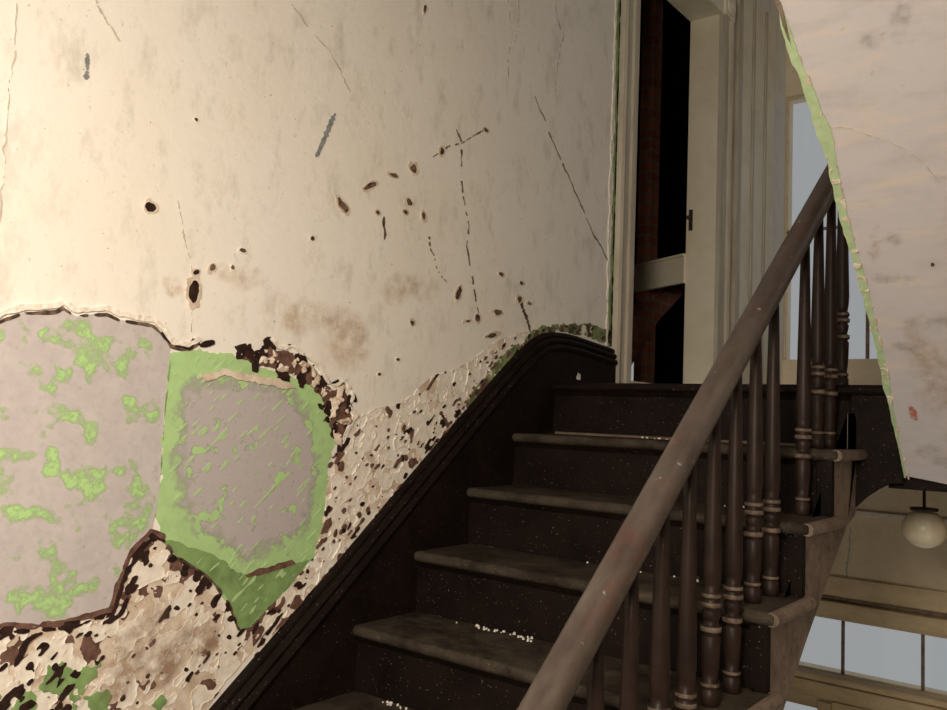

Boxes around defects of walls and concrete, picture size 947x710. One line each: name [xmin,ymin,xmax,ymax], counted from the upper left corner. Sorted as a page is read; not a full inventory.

crack [428,129,483,313]
crack [535,0,608,261]
peeling [0,0,621,710]